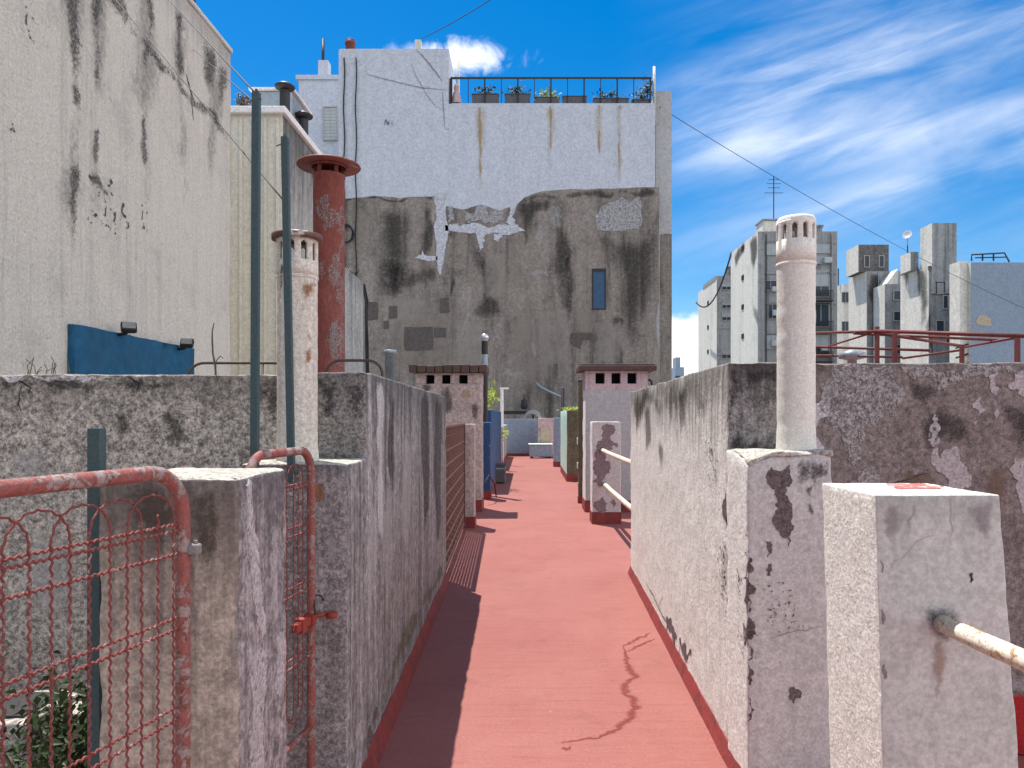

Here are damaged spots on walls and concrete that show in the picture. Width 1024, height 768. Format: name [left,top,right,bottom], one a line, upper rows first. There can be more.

water stain [68,0,227,133]
water stain [70,130,147,238]
water stain [382,212,434,291]
peeling [447,205,519,252]
water stain [521,196,572,315]
peeling [595,197,642,231]
water stain [614,234,654,328]
peeling [593,424,618,513]
water stain [634,387,706,458]
peeling [815,363,1024,489]
flaking render [743,465,794,722]